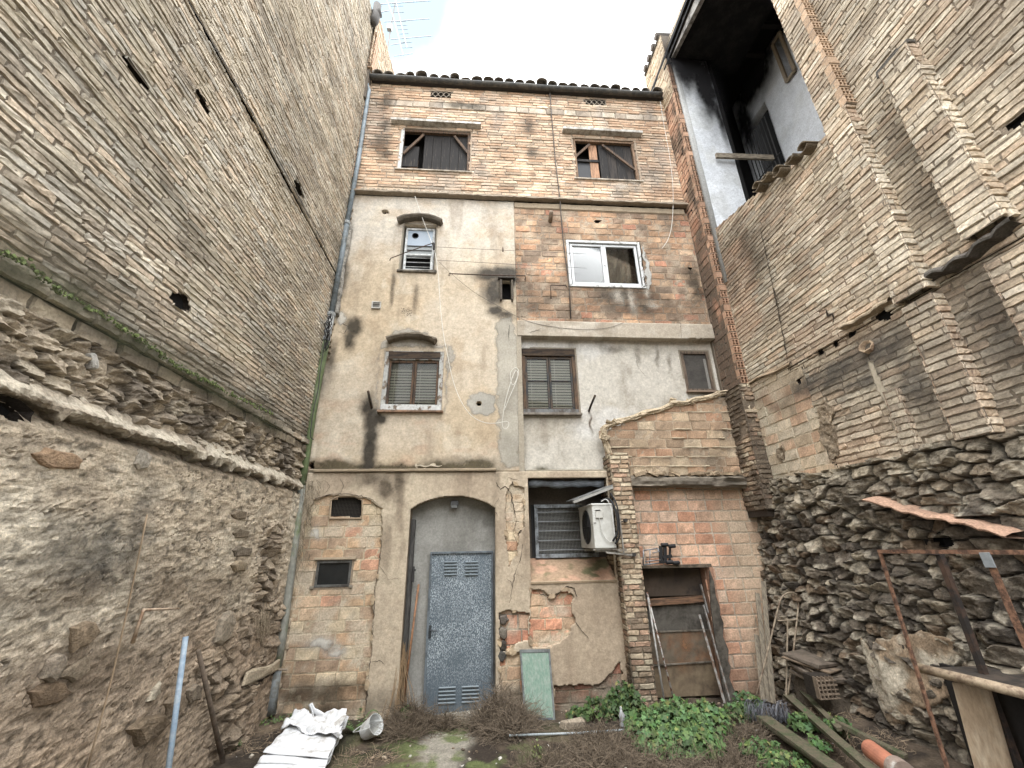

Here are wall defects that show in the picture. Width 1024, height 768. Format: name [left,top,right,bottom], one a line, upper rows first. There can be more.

leakage [345,318,361,348]
leakage [309,398,493,496]
crack [494,478,577,600]
spalling [497,587,575,710]
spalling [554,662,627,711]